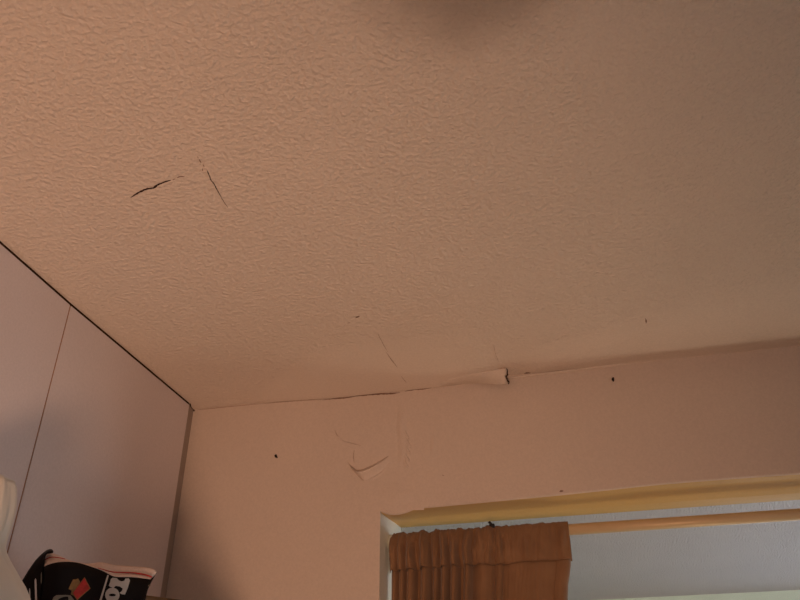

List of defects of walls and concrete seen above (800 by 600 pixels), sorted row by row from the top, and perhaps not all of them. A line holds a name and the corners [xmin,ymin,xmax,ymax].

crack [131,156,227,206]
crack [199,336,428,410]